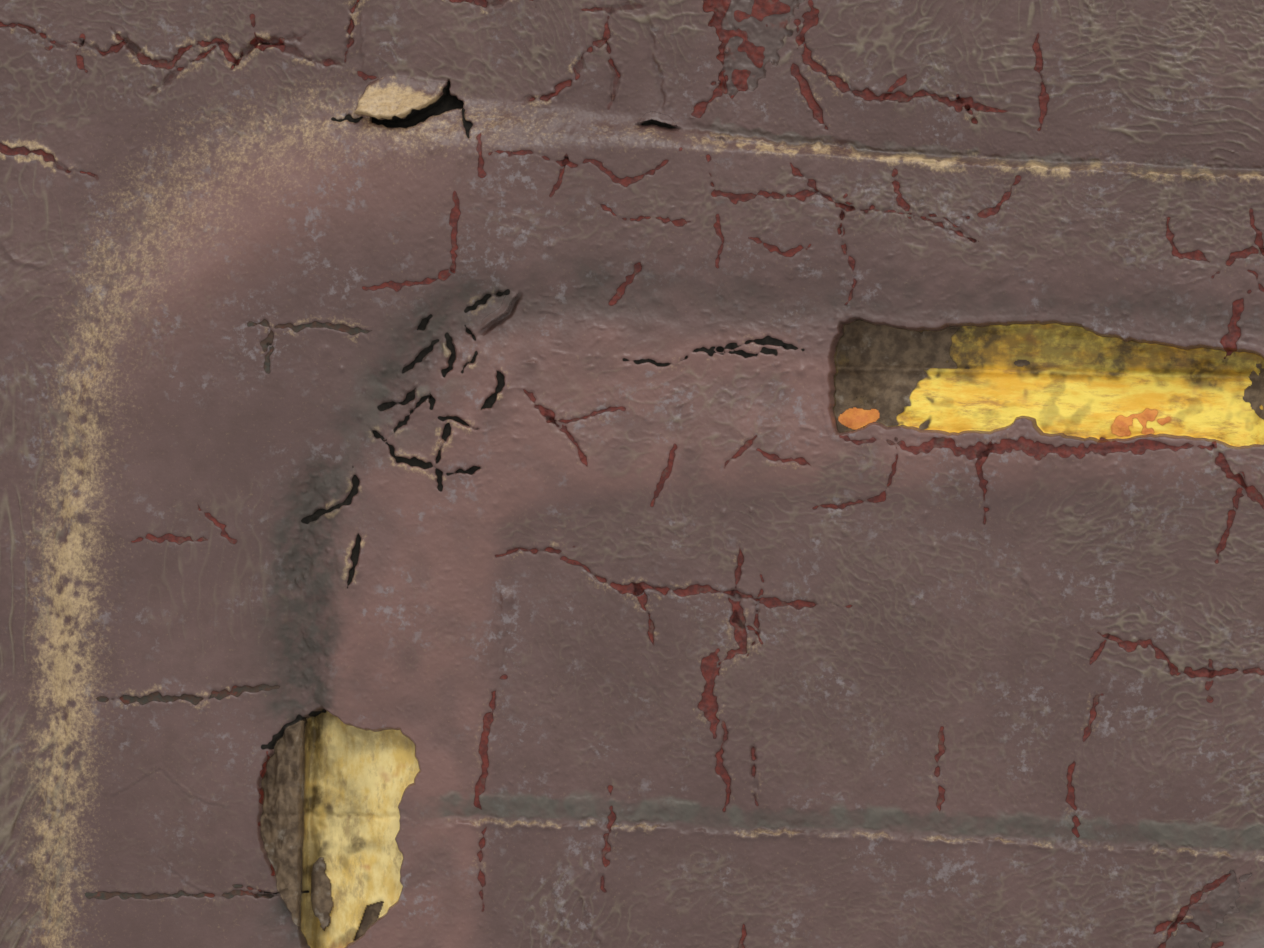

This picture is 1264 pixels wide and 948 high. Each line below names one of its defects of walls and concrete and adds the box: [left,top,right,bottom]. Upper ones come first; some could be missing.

crack [0,143,97,177]
crack [0,0,377,80]
peeling [331,76,473,138]
crack [373,289,626,491]
crack [362,133,1021,306]
crack [622,336,804,366]
crack [791,19,1007,130]
spalling [833,320,1264,460]
crack [1166,208,1264,359]
crack [96,684,280,705]
crack [495,546,816,812]
spalling [258,709,420,948]